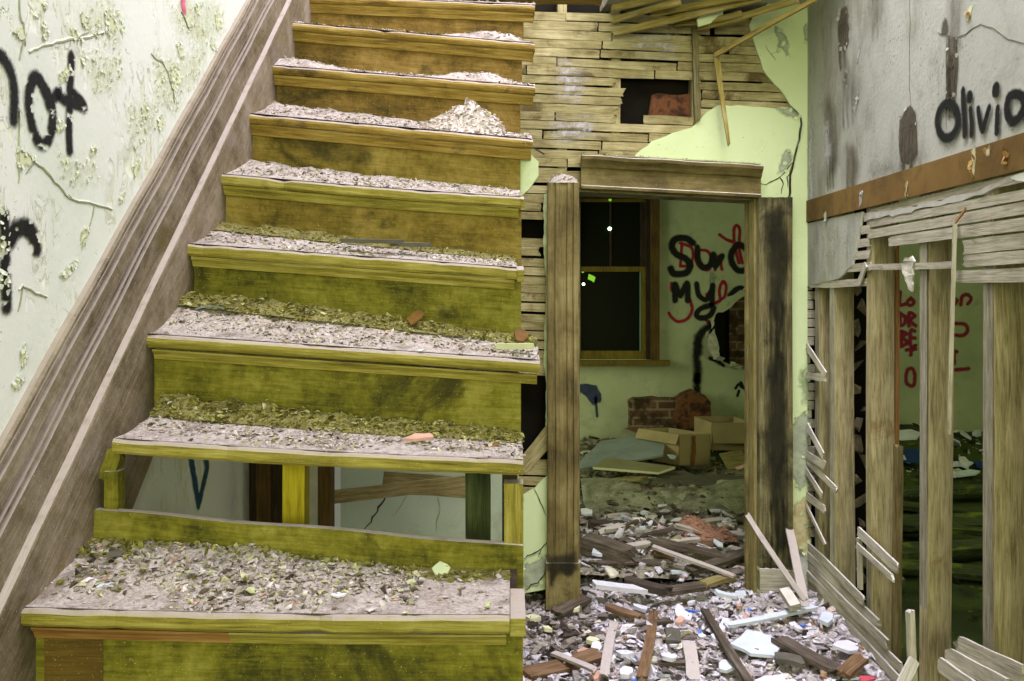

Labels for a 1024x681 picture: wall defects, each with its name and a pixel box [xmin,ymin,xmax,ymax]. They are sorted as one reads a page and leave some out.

peeling [59,1,126,93]
peeling [127,2,224,176]
water stain [836,7,856,101]
water stain [941,5,959,119]
crack [938,24,1023,79]
crack [761,118,804,197]
water stain [889,106,917,171]
flaking render [859,145,1024,220]
peeling [0,204,11,255]
peeling [0,269,11,296]
spalling [705,289,744,369]
crack [364,496,407,530]